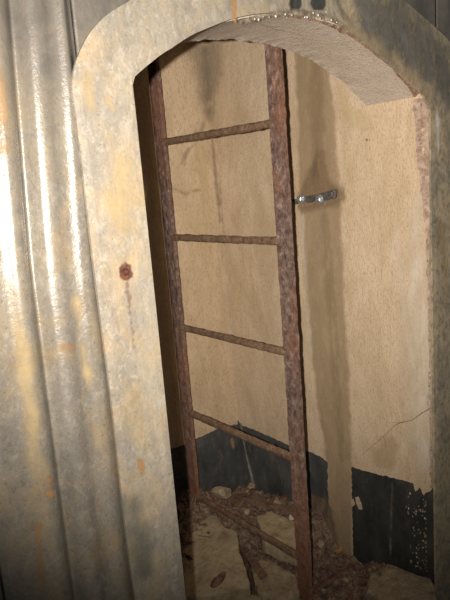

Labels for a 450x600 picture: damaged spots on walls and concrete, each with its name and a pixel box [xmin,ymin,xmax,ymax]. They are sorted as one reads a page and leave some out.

rust [120,262,133,280]
water stain [296,53,352,555]
crack [363,407,432,455]